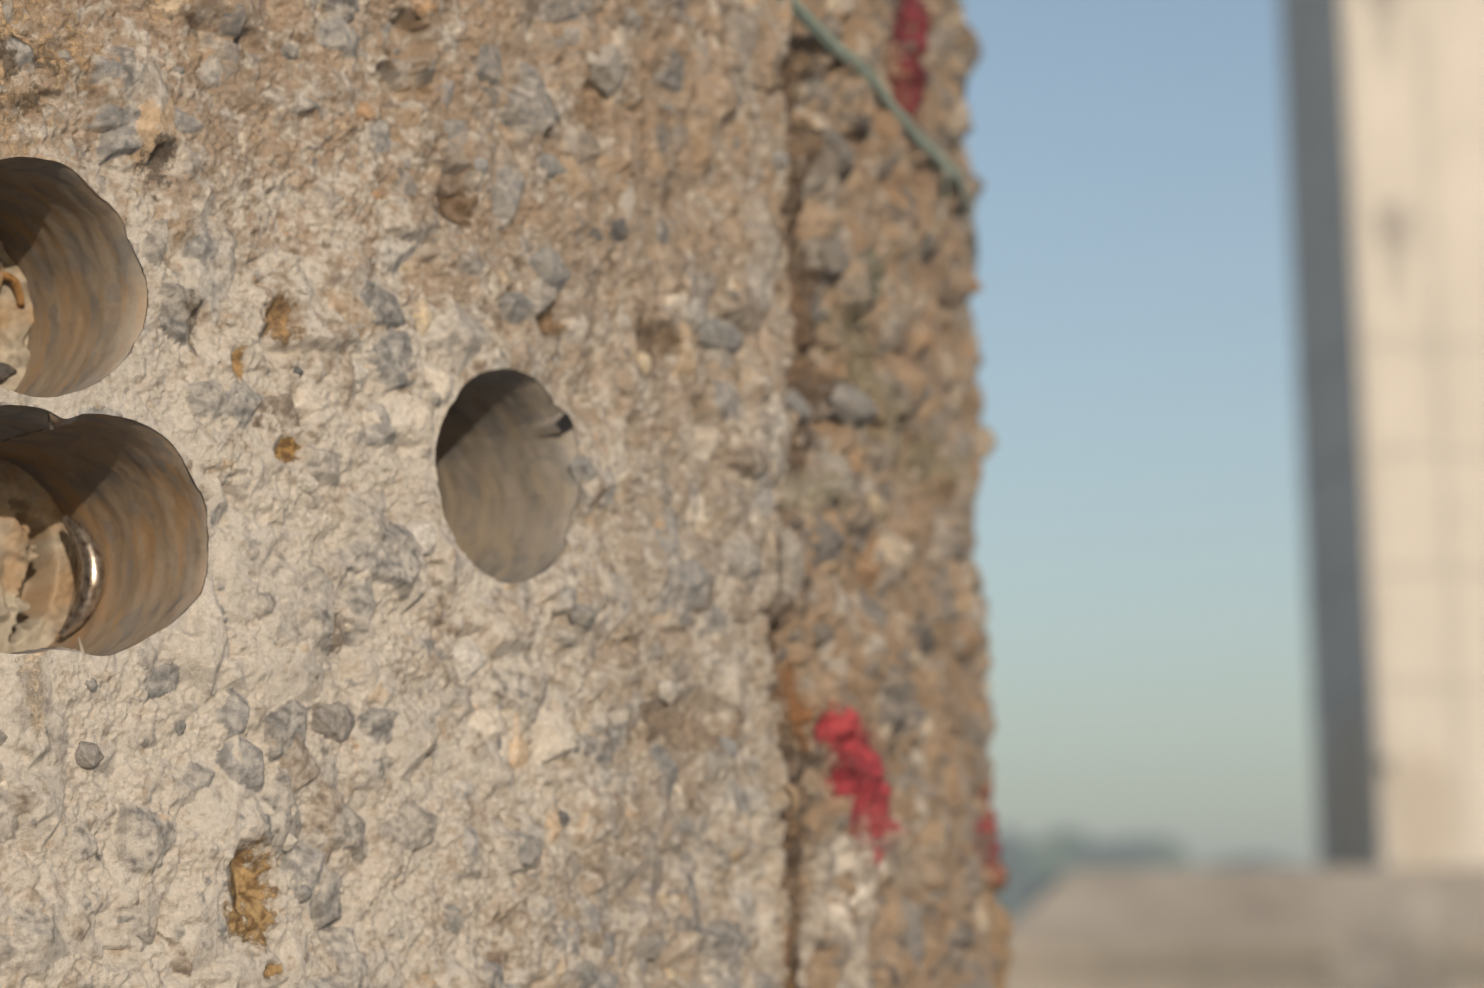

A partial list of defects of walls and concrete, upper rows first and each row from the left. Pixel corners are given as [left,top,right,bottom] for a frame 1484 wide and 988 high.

crack [752,24,859,538]
crack [746,580,830,988]